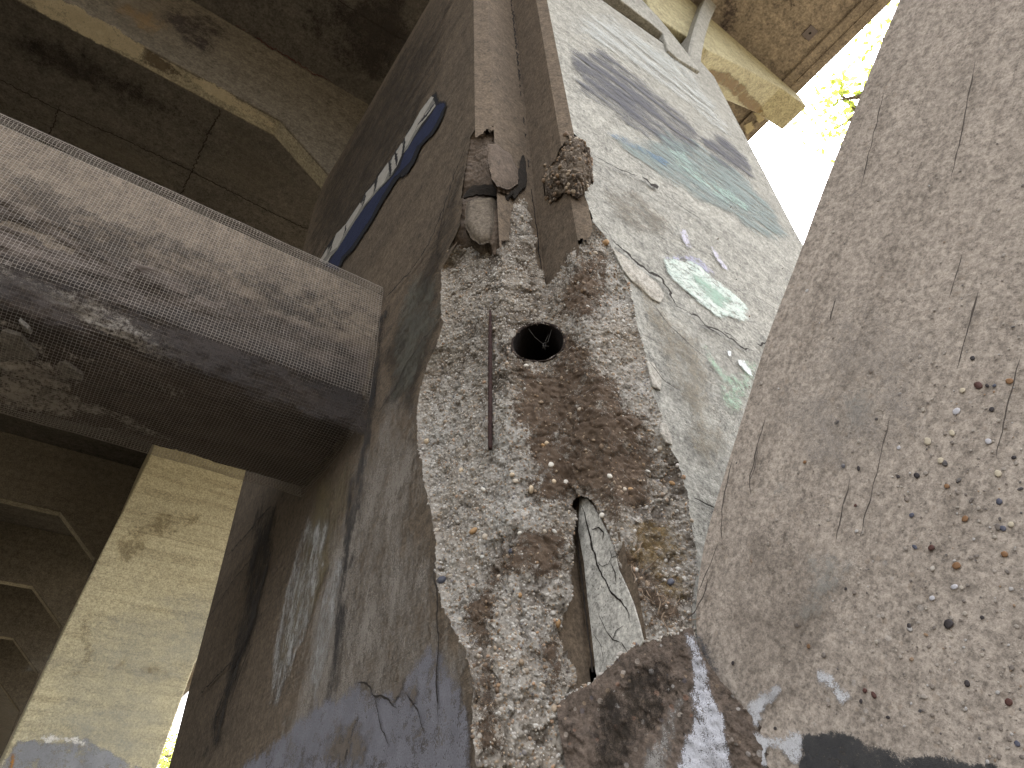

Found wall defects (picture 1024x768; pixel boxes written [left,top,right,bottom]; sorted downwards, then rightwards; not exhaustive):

crack [950,64,975,181]
crack [613,240,766,354]
spalling [416,129,699,768]
crack [581,506,630,656]
leakage [507,248,731,768]
crack [836,421,889,539]
crack [996,356,1021,457]
crack [355,574,439,743]